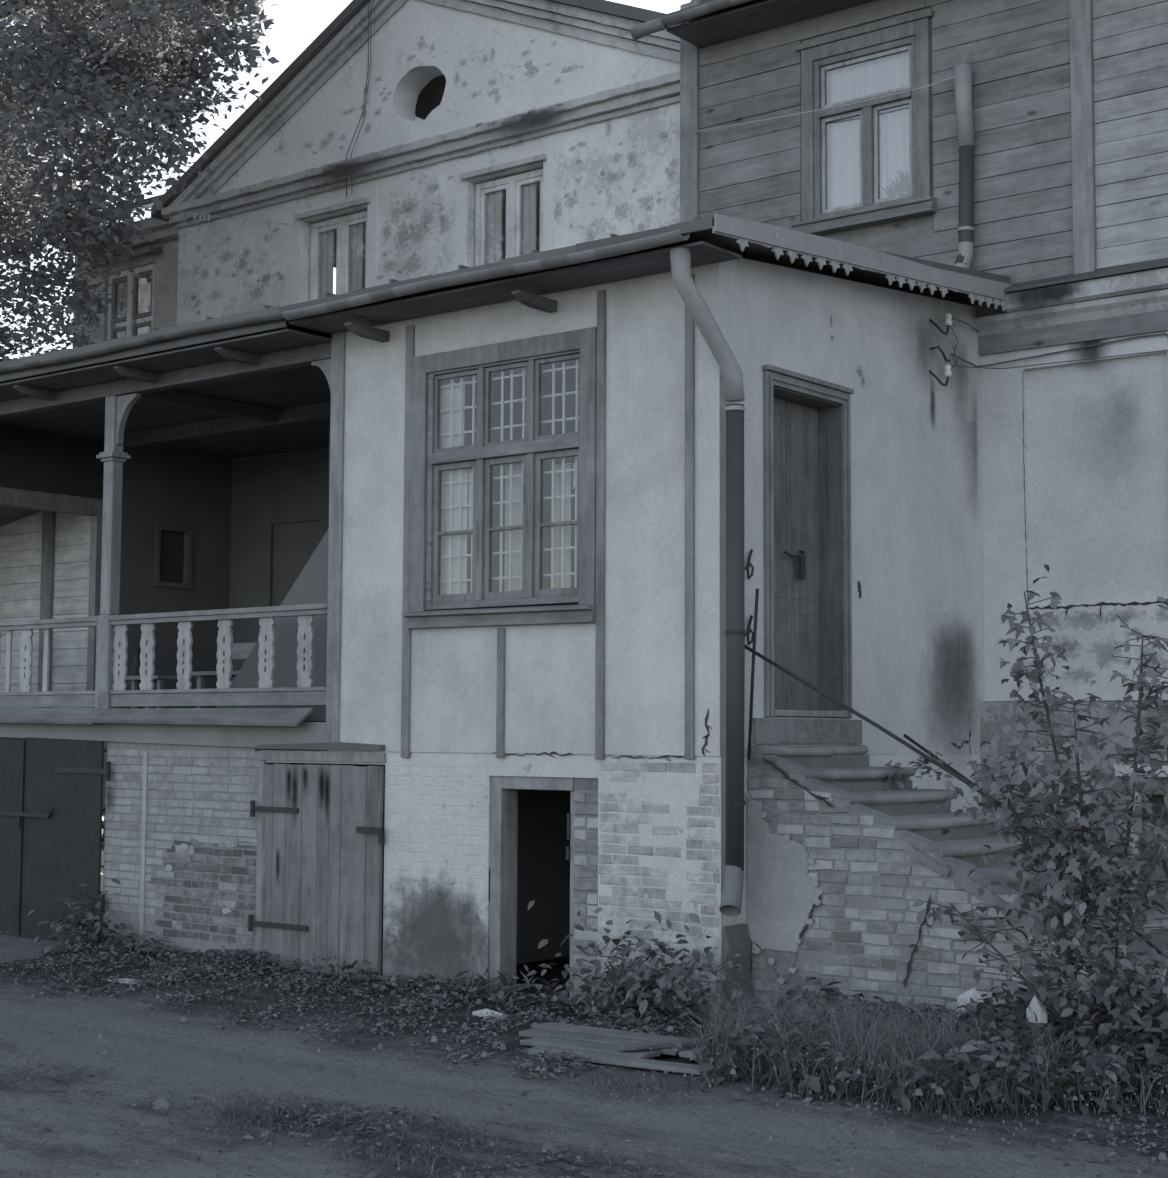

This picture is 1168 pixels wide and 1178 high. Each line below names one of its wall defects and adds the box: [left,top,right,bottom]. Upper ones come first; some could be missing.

crack [610,709,711,762]
leakage [287,769,328,812]
spalling [148,838,257,945]
leakage [399,892,471,986]
crack [903,894,935,987]
spalling [745,756,1155,1040]